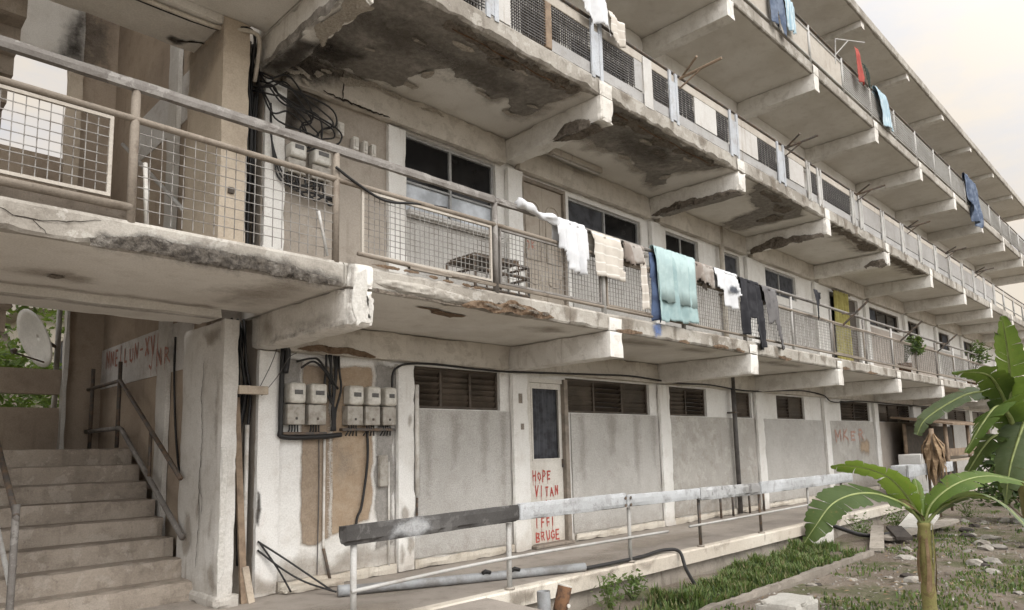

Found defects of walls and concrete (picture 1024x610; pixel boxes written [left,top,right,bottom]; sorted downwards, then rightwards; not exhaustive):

flaking render [262,0,582,116]
flaking render [553,107,723,186]
crack [0,207,101,233]
flaking render [652,184,802,230]
spalling [750,223,925,275]
spalling [90,234,374,325]
spalling [418,300,554,319]
flaking render [284,359,302,385]
flaking render [375,364,395,388]
flaking render [374,425,396,521]